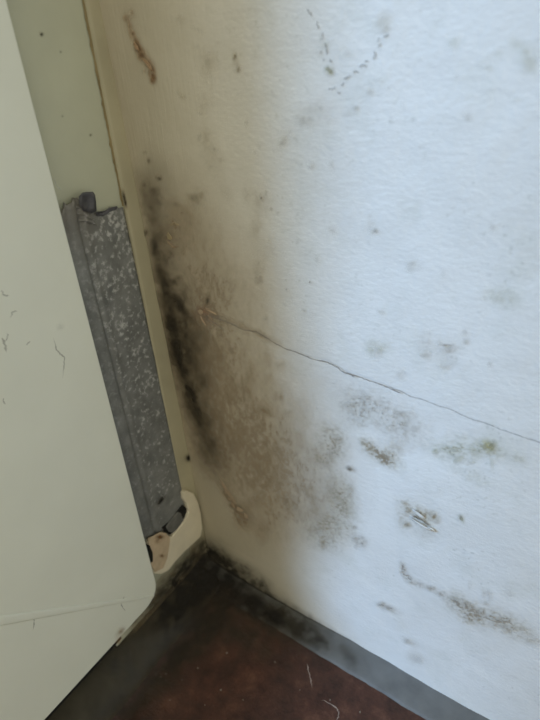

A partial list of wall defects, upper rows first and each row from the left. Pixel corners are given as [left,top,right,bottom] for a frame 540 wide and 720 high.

corrosion [132,32,155,82]
water stain [145,212,324,525]
crack [204,313,540,443]
water stain [364,443,393,465]
water stain [452,600,511,624]